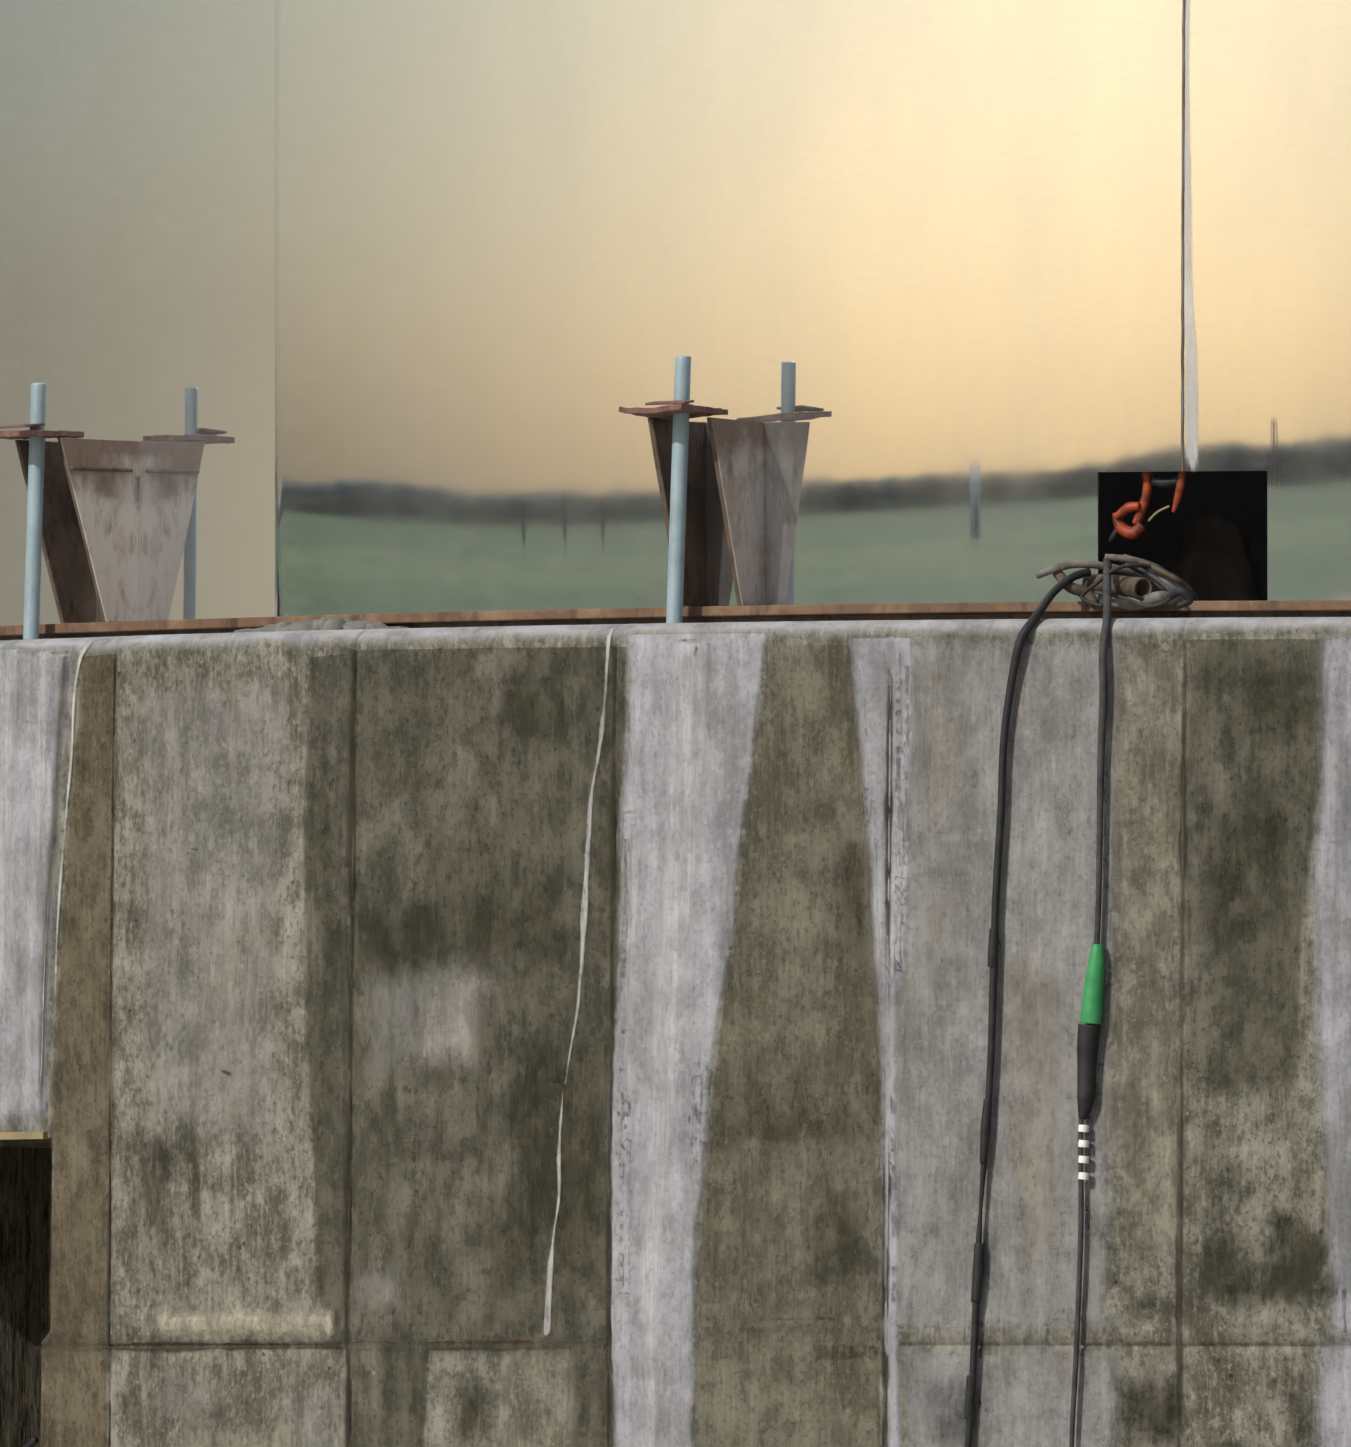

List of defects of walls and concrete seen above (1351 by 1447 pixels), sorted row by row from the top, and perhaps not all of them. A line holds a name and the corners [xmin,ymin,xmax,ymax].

damp [0,643,117,1447]
damp [140,1140,194,1236]
damp [147,692,276,1136]
damp [305,628,1351,1447]
damp [188,1401,320,1447]